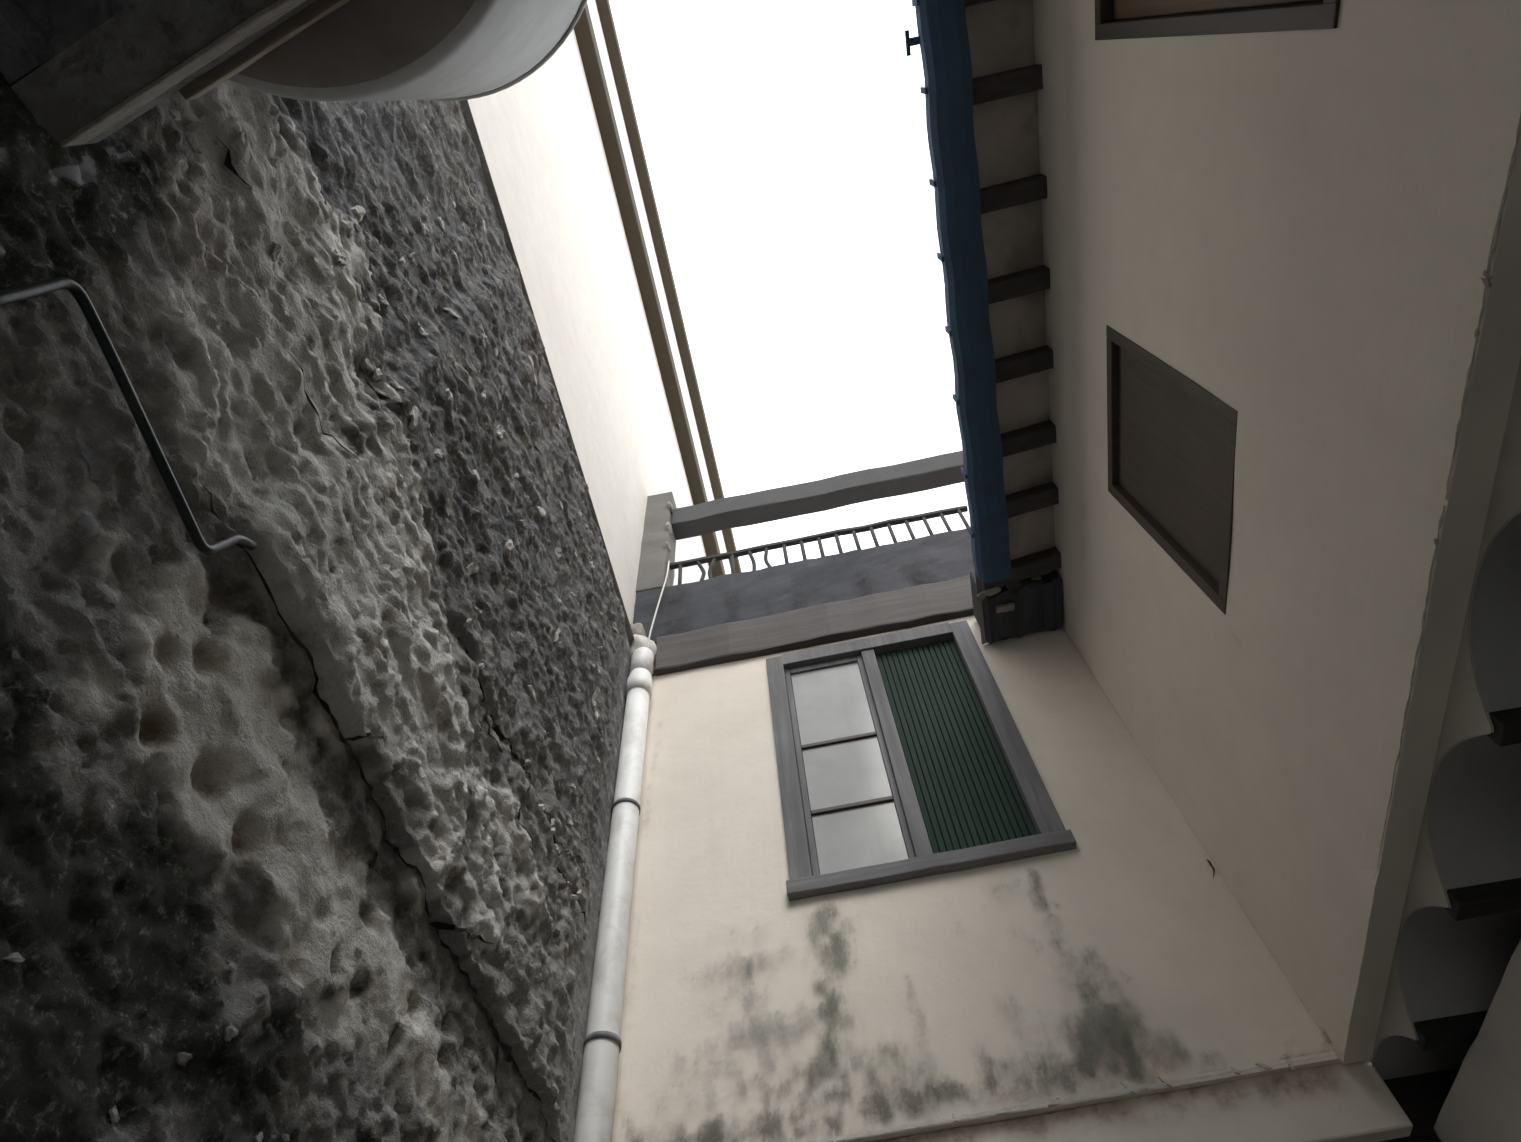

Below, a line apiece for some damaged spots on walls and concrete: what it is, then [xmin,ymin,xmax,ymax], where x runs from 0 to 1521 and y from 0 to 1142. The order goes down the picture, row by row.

damp [273,633,442,983]
crack [201,484,555,1142]
crack [448,618,588,928]
damp [811,904,845,967]
damp [456,1009,542,1142]
damp [680,1120,737,1142]
damp [754,1111,803,1139]
damp [809,983,839,1082]
damp [826,1081,965,1121]
damp [1025,1006,1143,1088]